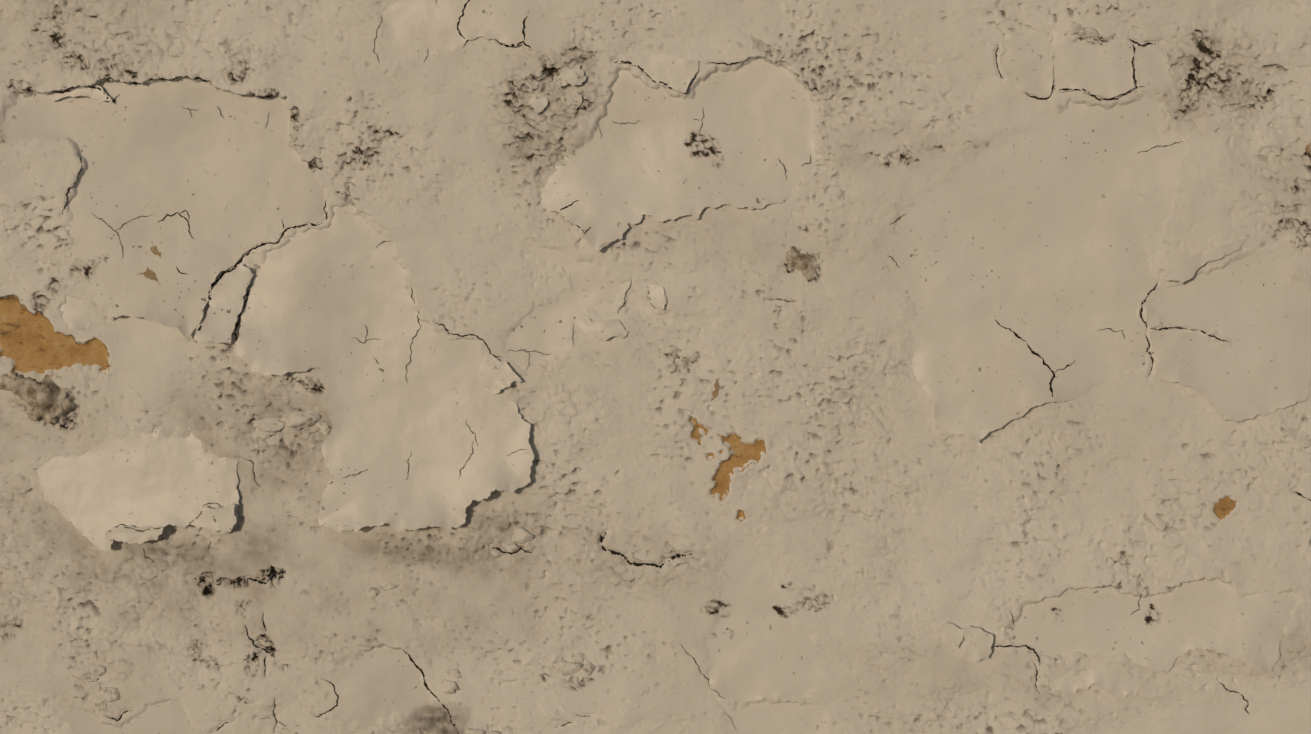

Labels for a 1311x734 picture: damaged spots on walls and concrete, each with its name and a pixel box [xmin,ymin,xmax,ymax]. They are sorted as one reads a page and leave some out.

crack [62,153,194,258]
crack [176,201,327,341]
peeling [0,54,820,551]
peeling [858,31,1311,443]
crack [1098,282,1229,375]
peeling [692,510,860,734]
peeling [936,578,1297,699]